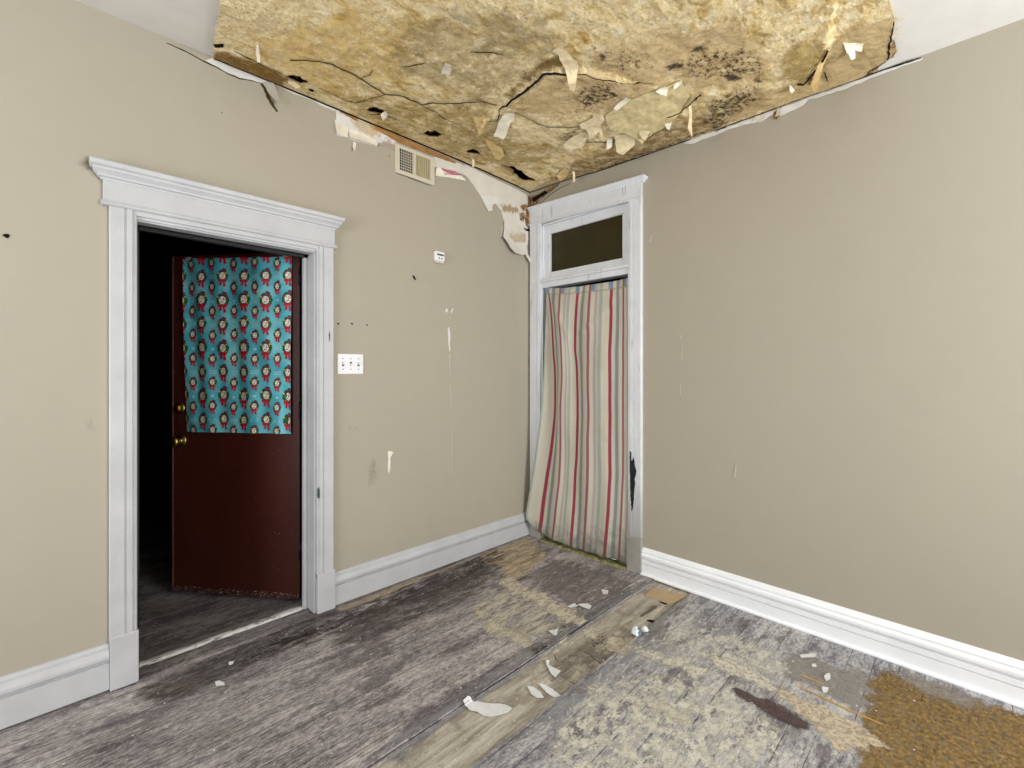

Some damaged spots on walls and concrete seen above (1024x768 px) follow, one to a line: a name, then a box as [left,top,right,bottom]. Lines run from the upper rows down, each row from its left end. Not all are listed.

peeling [206,58,575,262]
crack [167,43,701,219]
peeling [552,48,578,91]
peeling [563,98,650,155]
damp [509,19,897,186]
peeling [682,40,923,144]